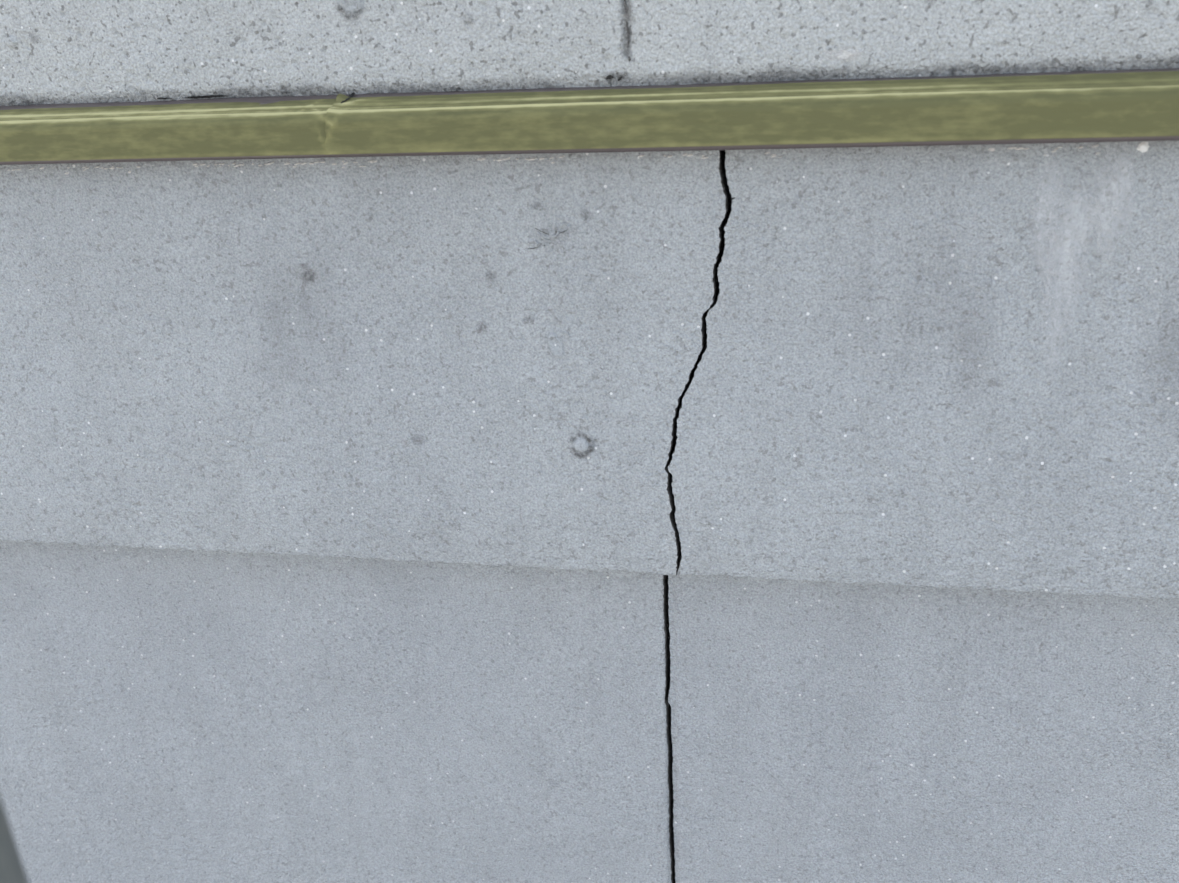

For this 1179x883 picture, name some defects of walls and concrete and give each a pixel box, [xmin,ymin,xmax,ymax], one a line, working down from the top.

crack [663,150,735,883]